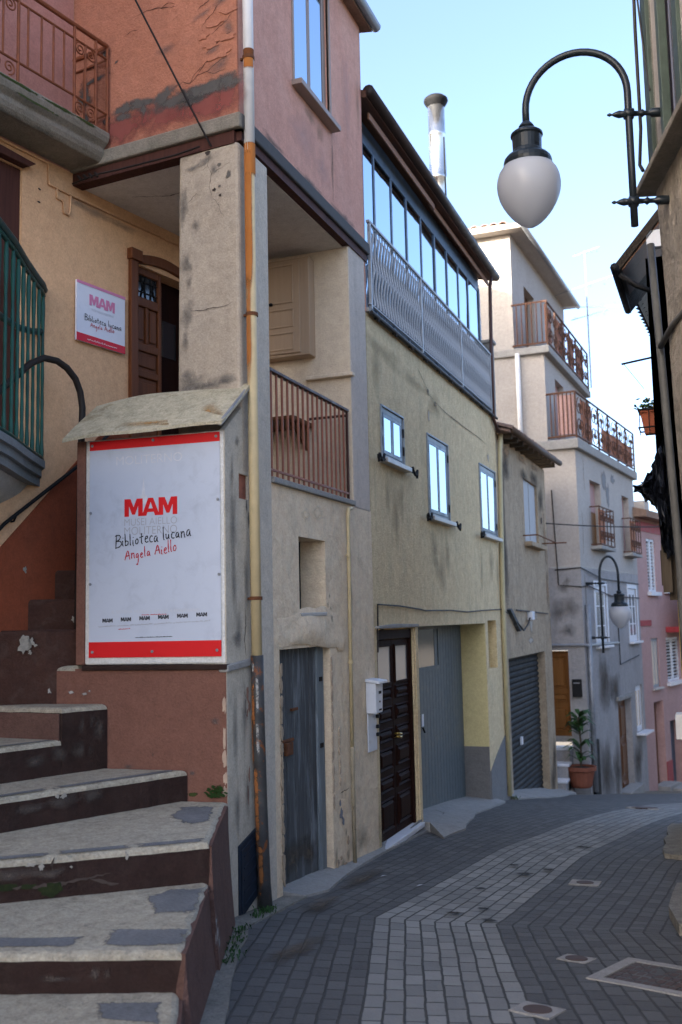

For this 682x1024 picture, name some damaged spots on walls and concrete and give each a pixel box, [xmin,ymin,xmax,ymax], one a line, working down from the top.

crack [125,0,234,86]
peeling [18,635,38,655]
rust [251,685,264,895]